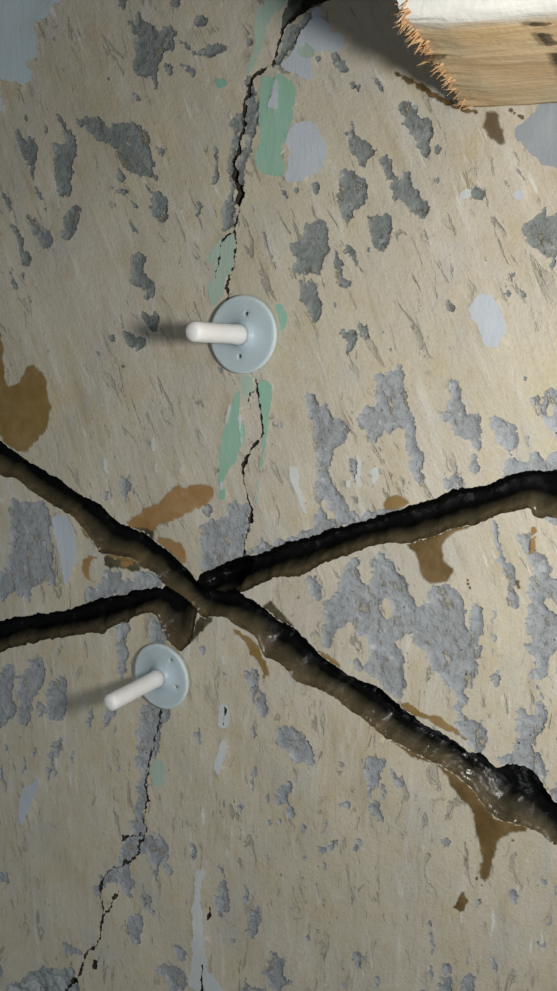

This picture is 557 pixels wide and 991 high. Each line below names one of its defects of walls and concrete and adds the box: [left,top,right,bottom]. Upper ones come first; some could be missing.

peeling [0,0,60,85]
flaking render [9,113,169,290]
crack [215,0,330,300]
damp [0,334,51,451]
flaking render [108,251,160,351]
damp [127,485,214,564]
crack [241,373,265,556]
peeling [0,363,557,845]
flaking render [339,323,370,356]
damp [407,525,470,583]
crack [65,709,163,991]
peeling [156,842,223,991]